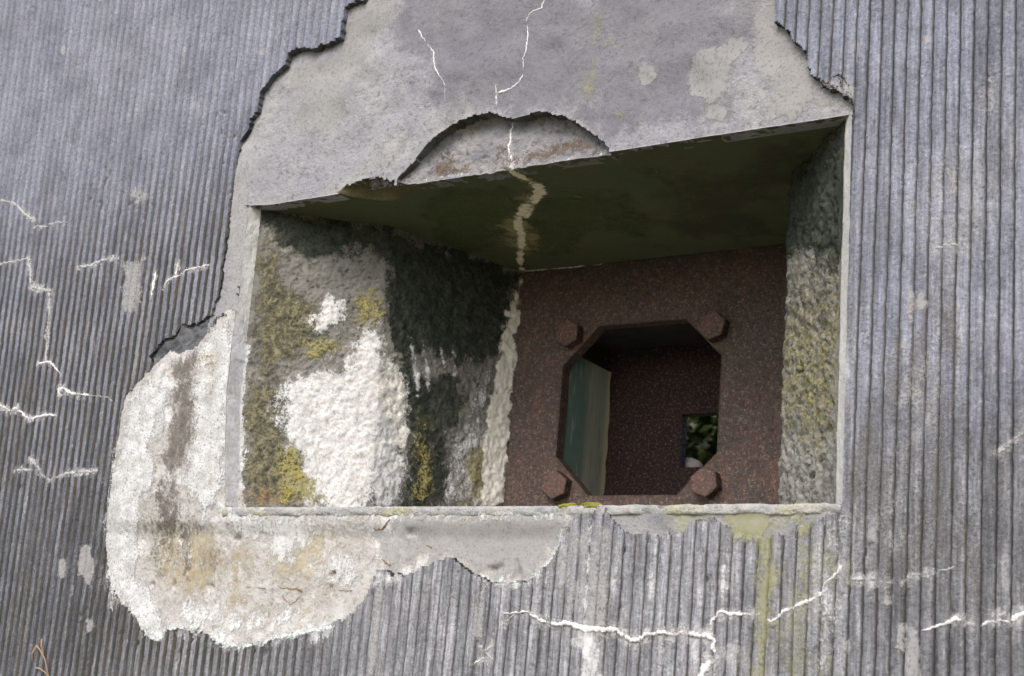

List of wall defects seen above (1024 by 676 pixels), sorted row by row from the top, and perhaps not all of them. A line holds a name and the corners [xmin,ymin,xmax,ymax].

crack [416,29,446,94]
crack [493,1,601,271]
crack [0,199,68,229]
crack [0,255,119,422]
crack [149,259,209,299]
spalling [105,0,855,649]
crack [14,457,98,483]
water stain [179,163,615,676]
crack [474,561,955,676]
crack [920,605,1024,631]